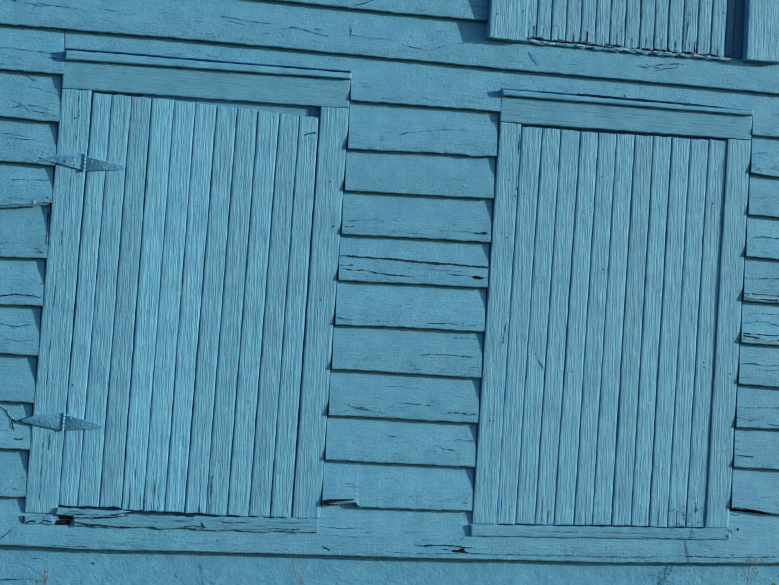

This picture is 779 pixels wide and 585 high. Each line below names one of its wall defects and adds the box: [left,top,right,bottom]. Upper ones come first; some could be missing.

crack [339,255,489,278]
crack [0,406,24,441]